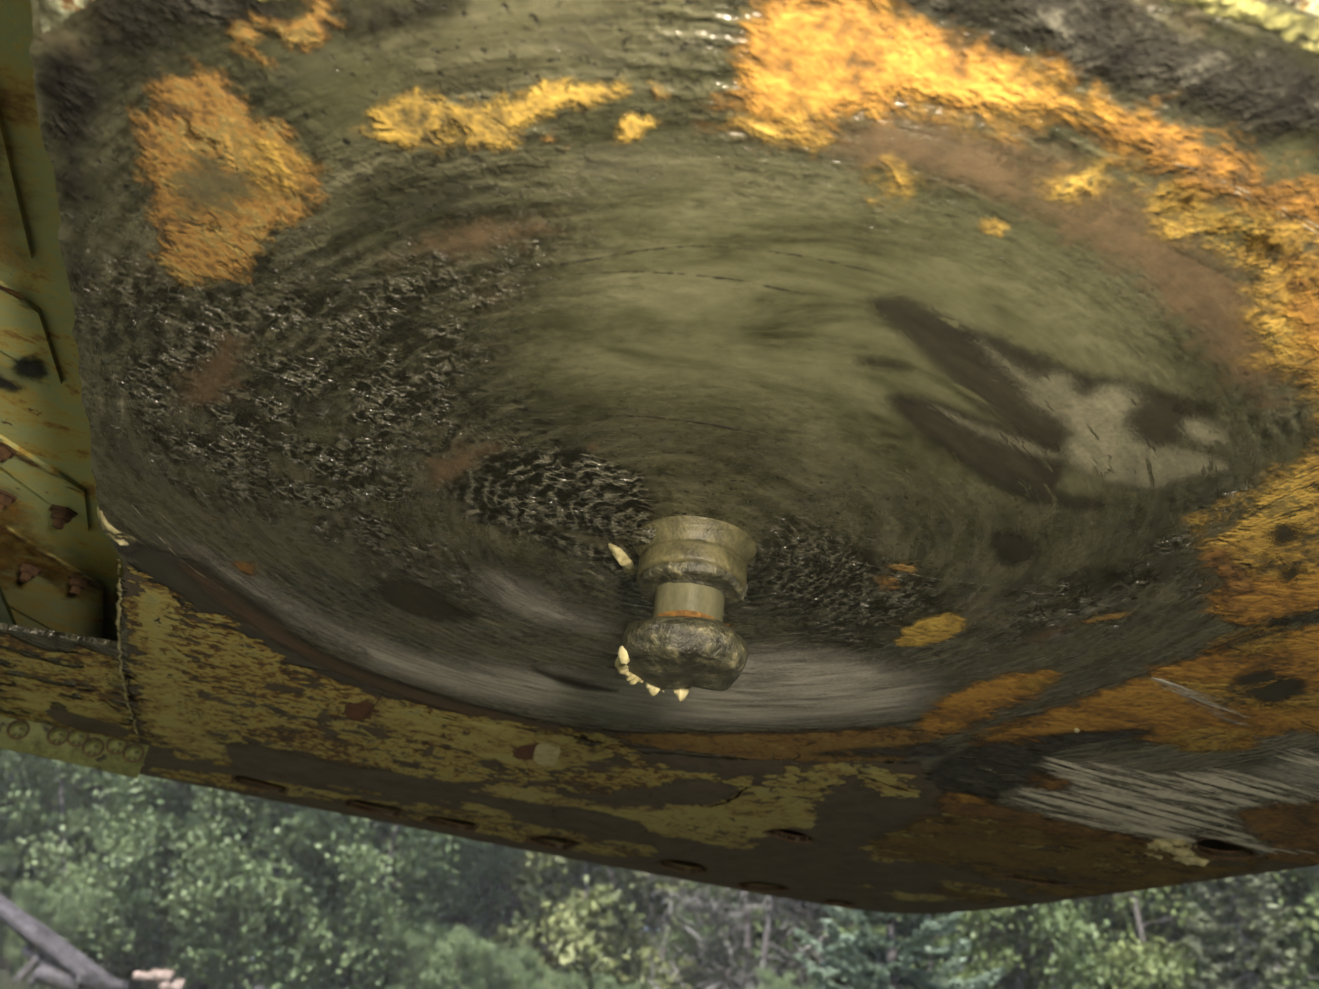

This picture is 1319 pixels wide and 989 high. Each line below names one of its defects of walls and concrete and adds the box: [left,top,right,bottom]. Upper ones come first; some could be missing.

corrosion [129,66,327,287]
corrosion [360,80,630,150]
corrosion [618,113,654,143]
corrosion [716,0,1319,398]
corrosion [16,454,82,492]
corrosion [174,441,1319,762]
peeling [0,567,930,858]
corrosion [1028,774,1070,792]
corrosion [874,793,1319,903]